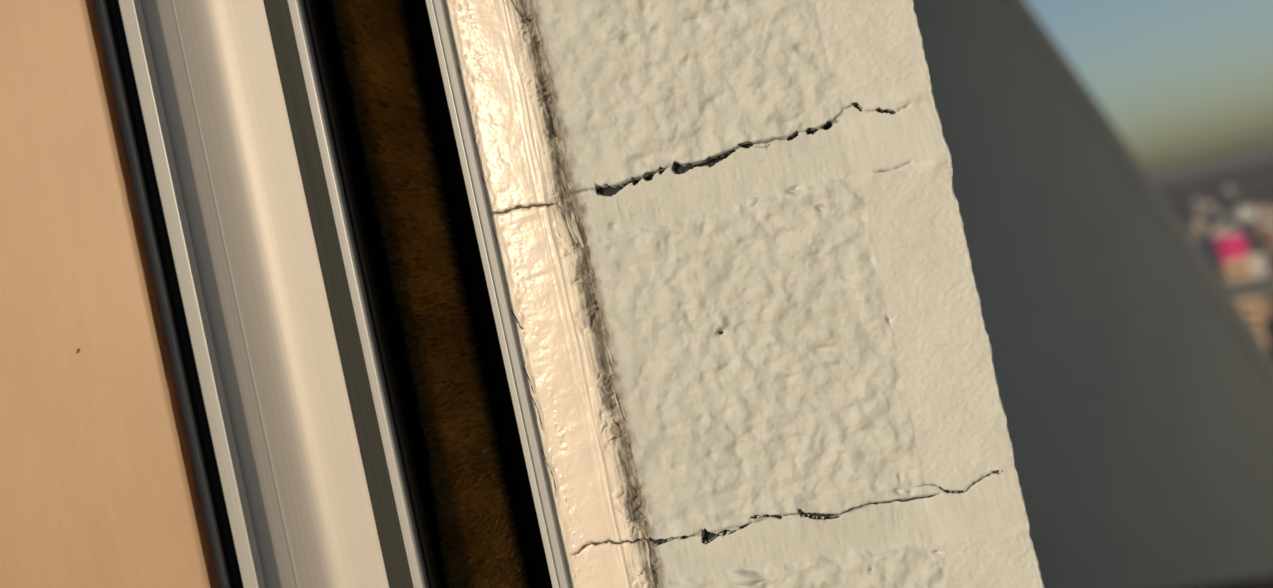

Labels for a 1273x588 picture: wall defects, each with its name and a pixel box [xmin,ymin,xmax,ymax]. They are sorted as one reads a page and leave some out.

crack [582,102,907,197]
crack [493,203,554,214]
crack [573,470,1003,555]